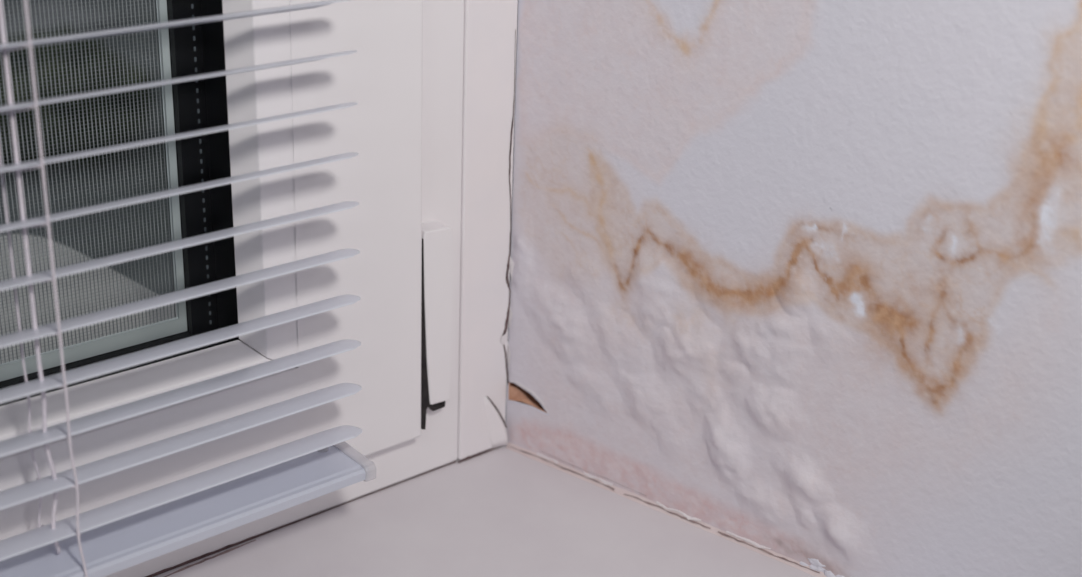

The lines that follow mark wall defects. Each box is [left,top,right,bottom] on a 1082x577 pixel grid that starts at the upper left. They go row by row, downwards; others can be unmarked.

flaking render [509,380,549,413]
damp [506,0,1082,577]